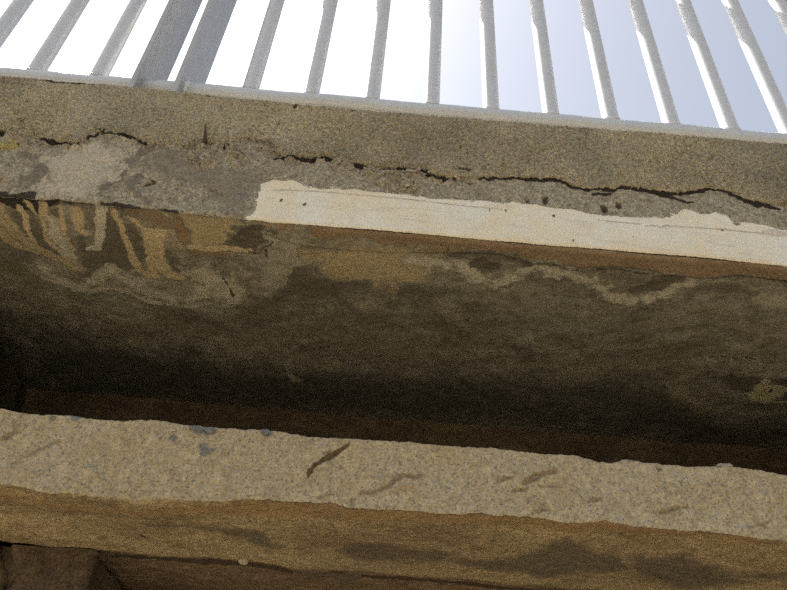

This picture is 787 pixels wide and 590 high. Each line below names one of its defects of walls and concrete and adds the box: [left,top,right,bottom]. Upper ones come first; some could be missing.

crack [40,128,147,147]
crack [272,155,333,164]
spalling [328,157,427,193]
crack [352,163,456,182]
damp [0,133,787,328]
damp [0,277,787,450]